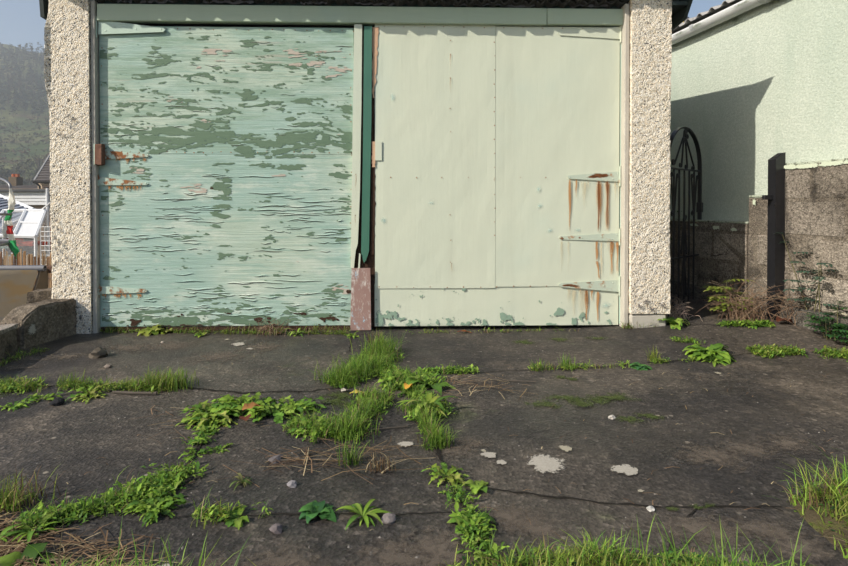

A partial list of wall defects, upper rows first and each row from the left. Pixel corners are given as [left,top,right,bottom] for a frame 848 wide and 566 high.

peeling [100,28,352,244]
rust [589,173,609,230]
peeling [211,227,278,267]
rust [562,242,600,320]
peeling [102,283,350,326]
peeling [376,305,488,326]
peeling [500,307,524,325]
peeling [546,302,589,325]
crack [239,445,467,516]
crack [488,487,783,517]